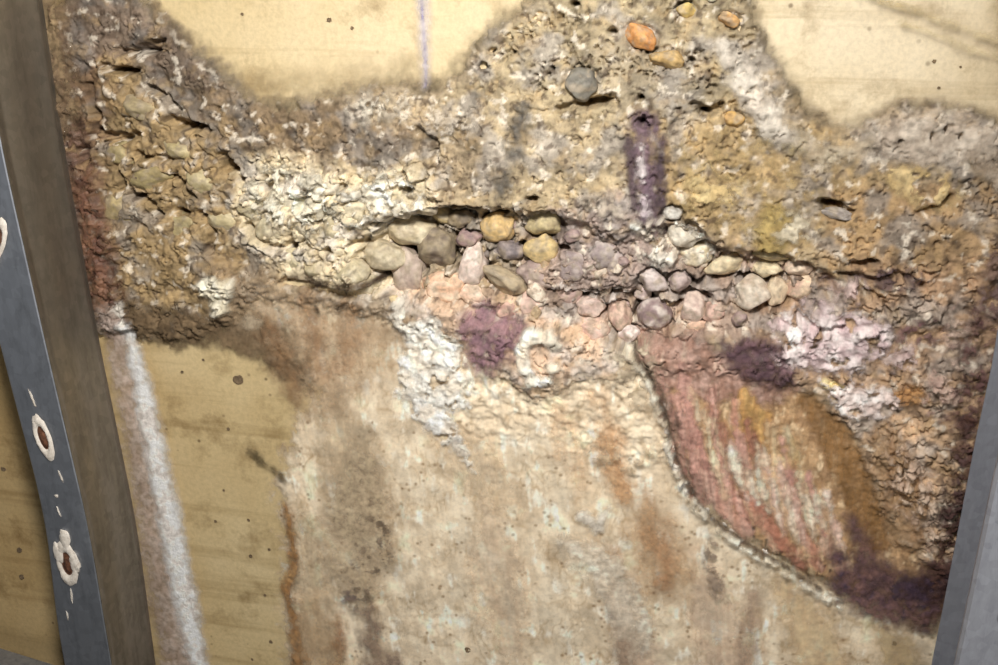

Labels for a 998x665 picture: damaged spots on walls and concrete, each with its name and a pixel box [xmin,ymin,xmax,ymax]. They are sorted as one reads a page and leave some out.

water stain [350,92,410,120]
water stain [426,110,467,135]
water stain [508,102,529,156]
water stain [626,39,998,266]
water stain [247,165,426,236]
water stain [578,193,622,217]
water stain [92,253,998,665]
corrosion [611,328,933,588]